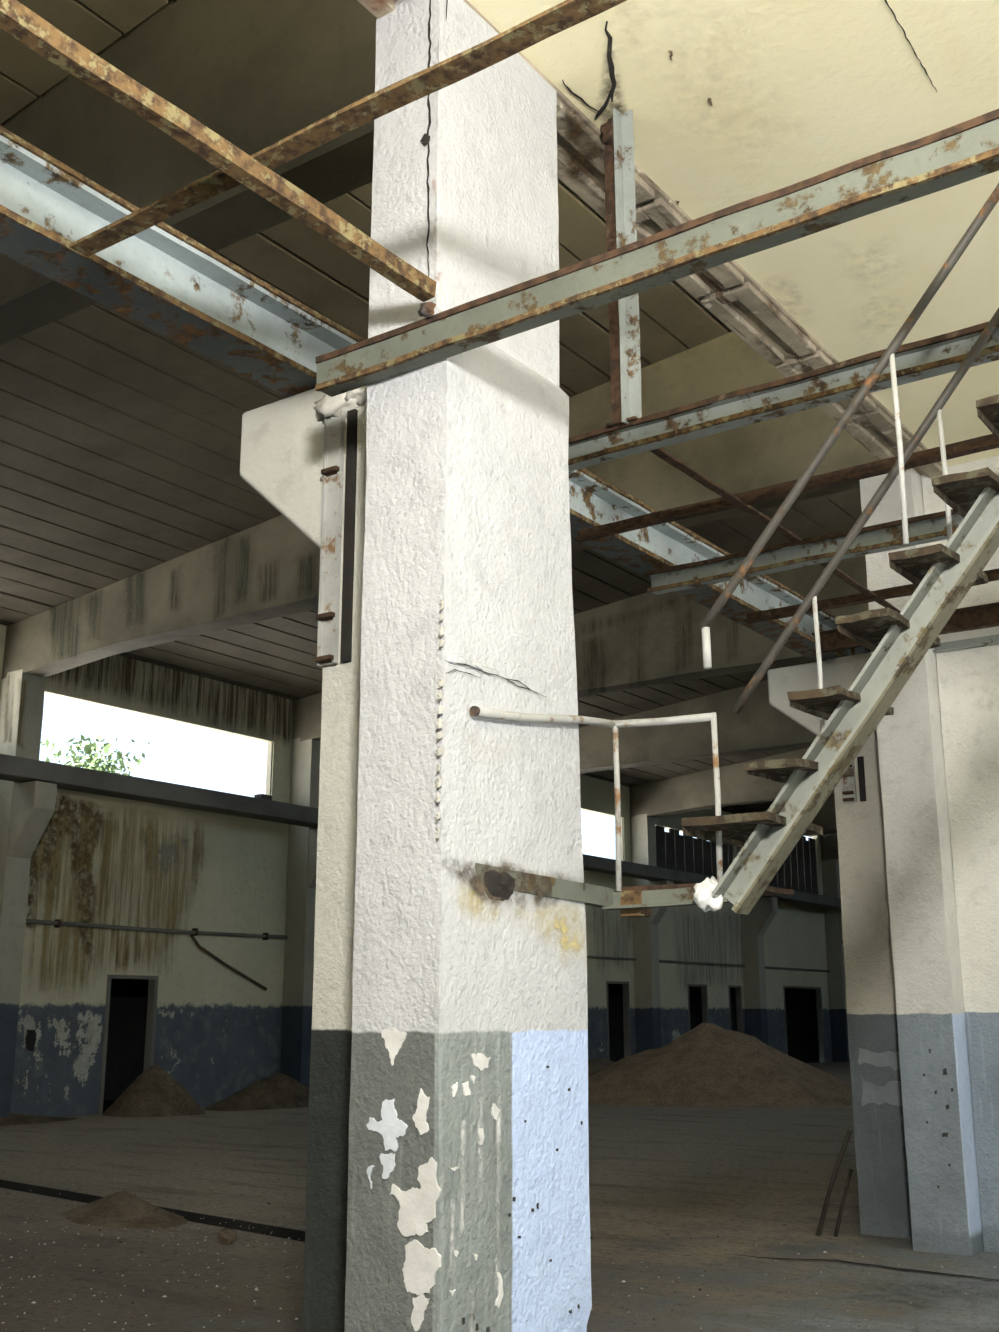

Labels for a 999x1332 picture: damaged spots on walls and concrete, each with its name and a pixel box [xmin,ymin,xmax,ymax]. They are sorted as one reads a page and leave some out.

crack [562,21,617,120]
crack [885,0,937,91]
corrosion [0,0,999,391]
crack [445,660,545,697]
water stain [33,810,199,983]
corrosion [458,863,564,904]
peeling [16,1009,102,1100]
peeling [450,1053,491,1097]
peeling [477,1104,500,1145]
peeling [366,1088,478,1331]
peeling [495,1272,503,1309]